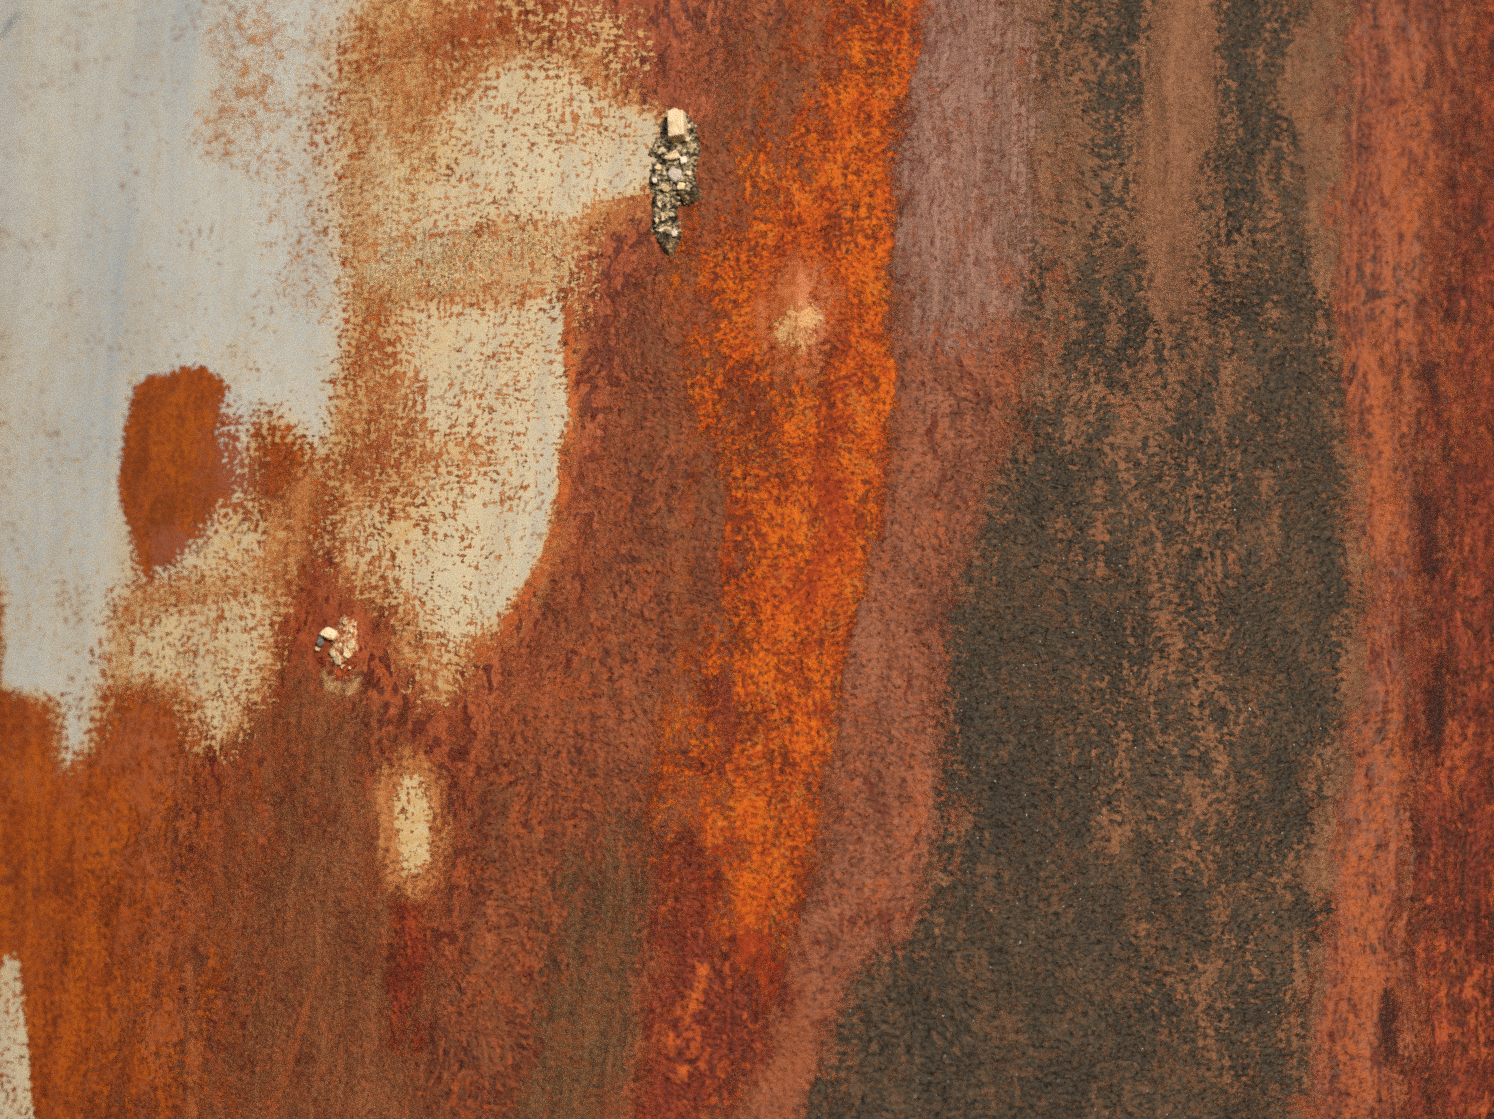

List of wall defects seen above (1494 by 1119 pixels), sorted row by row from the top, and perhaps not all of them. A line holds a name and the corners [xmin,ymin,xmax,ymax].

peeling [0,951,38,1119]
peeling [0,0,702,775]
peeling [389,770,435,880]
corrosion [0,0,1081,1119]
corrosion [1284,0,1494,1119]